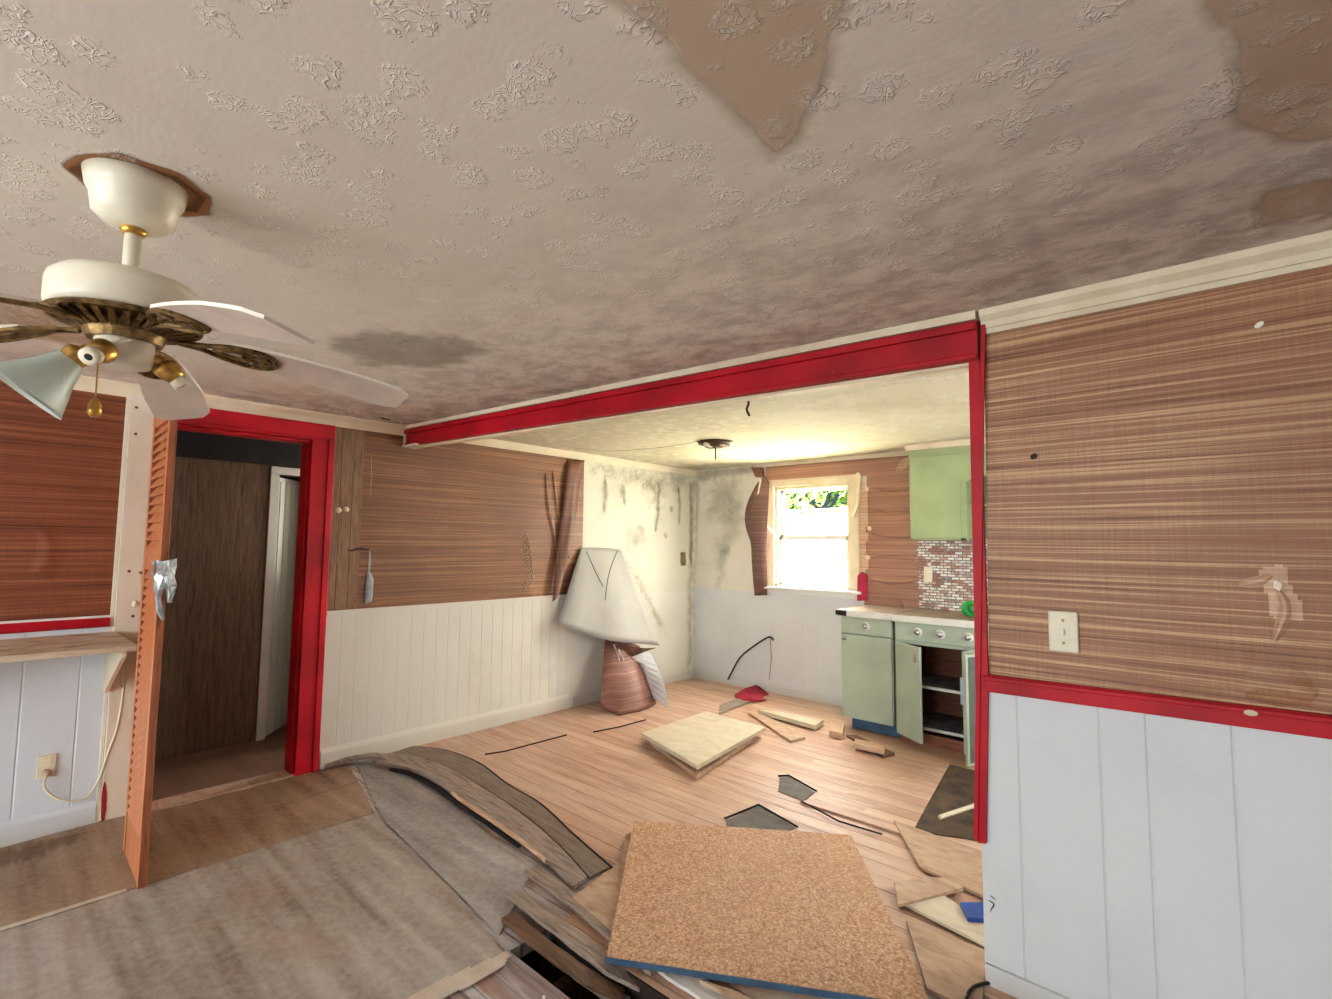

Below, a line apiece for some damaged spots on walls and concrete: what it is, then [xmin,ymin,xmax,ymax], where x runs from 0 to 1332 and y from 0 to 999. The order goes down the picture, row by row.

peeling [751,467,765,477]